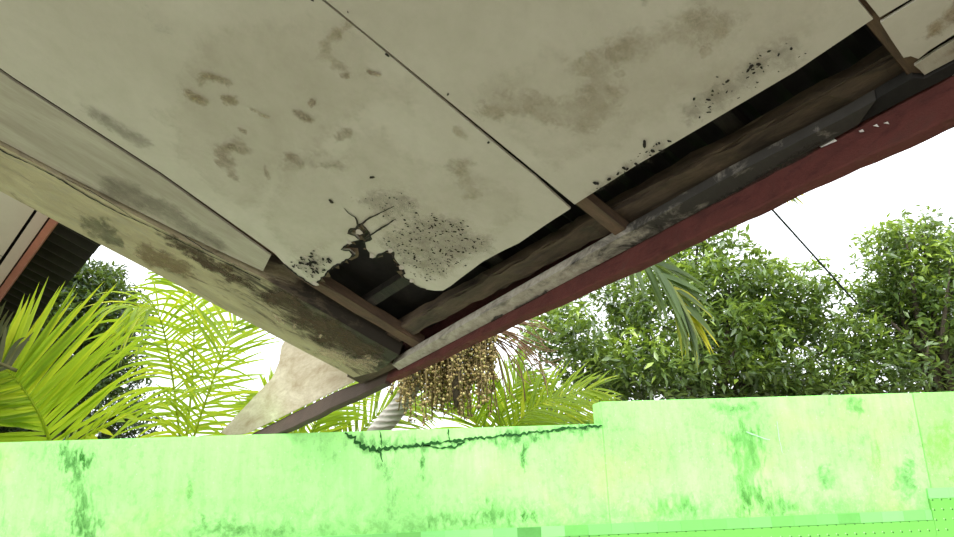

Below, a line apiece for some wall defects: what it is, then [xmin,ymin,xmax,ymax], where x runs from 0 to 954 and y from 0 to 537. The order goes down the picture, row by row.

damp [351,193,484,281]
crack [344,425,602,462]